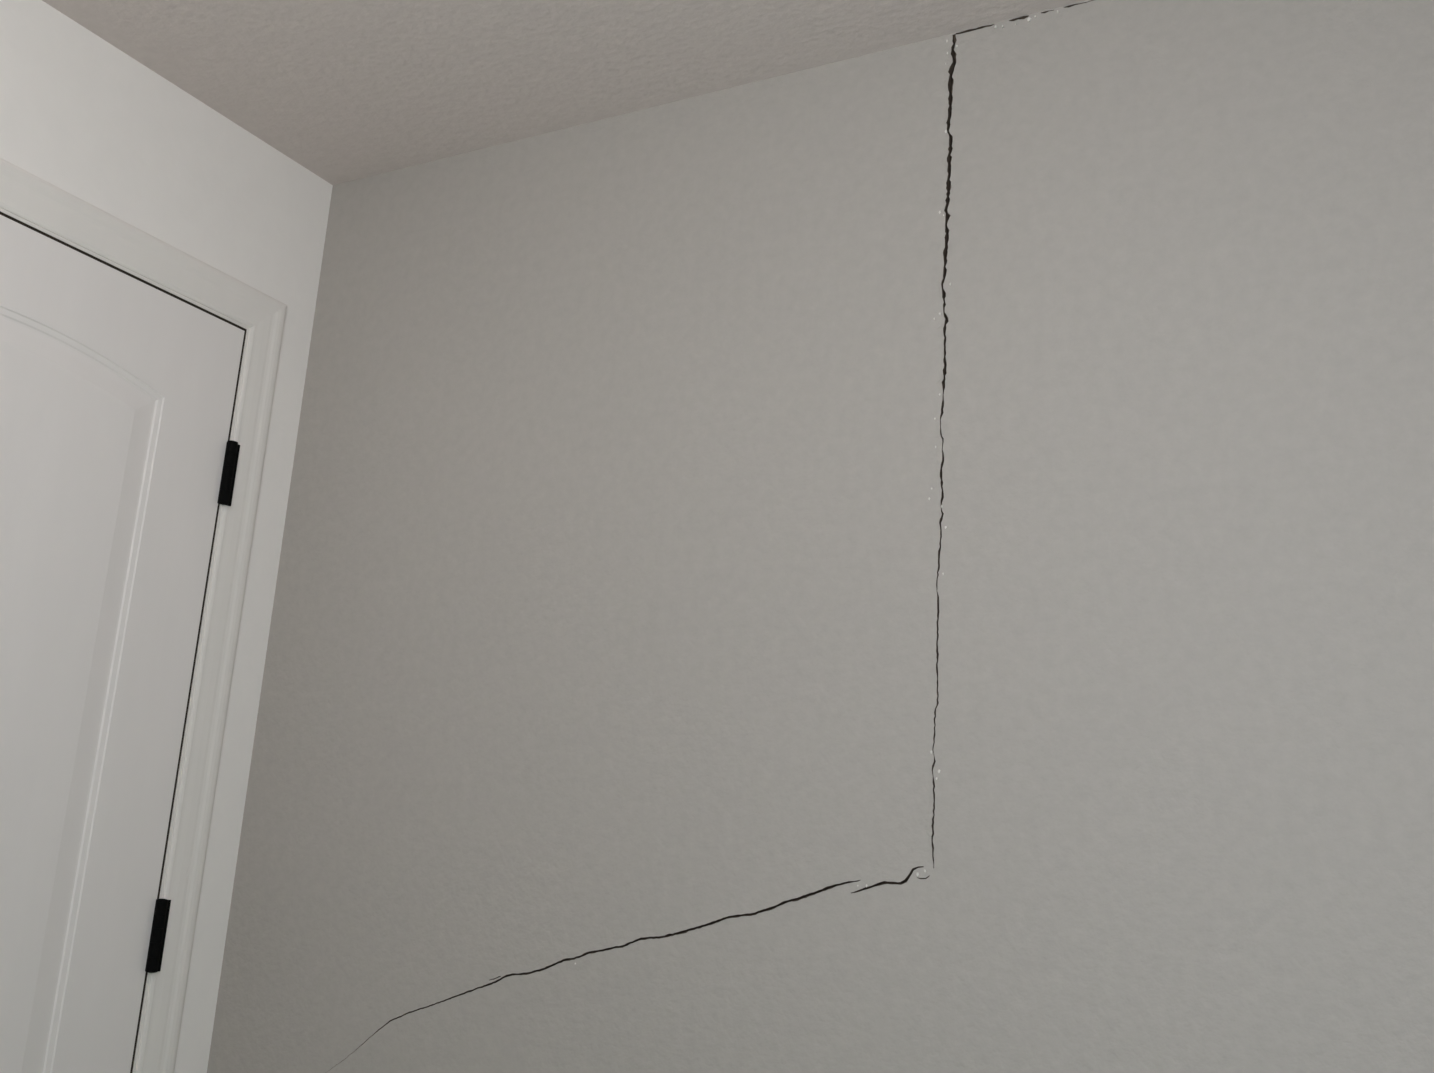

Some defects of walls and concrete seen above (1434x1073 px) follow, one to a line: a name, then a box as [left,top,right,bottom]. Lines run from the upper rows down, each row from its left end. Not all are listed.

crack [327,0,1093,1072]